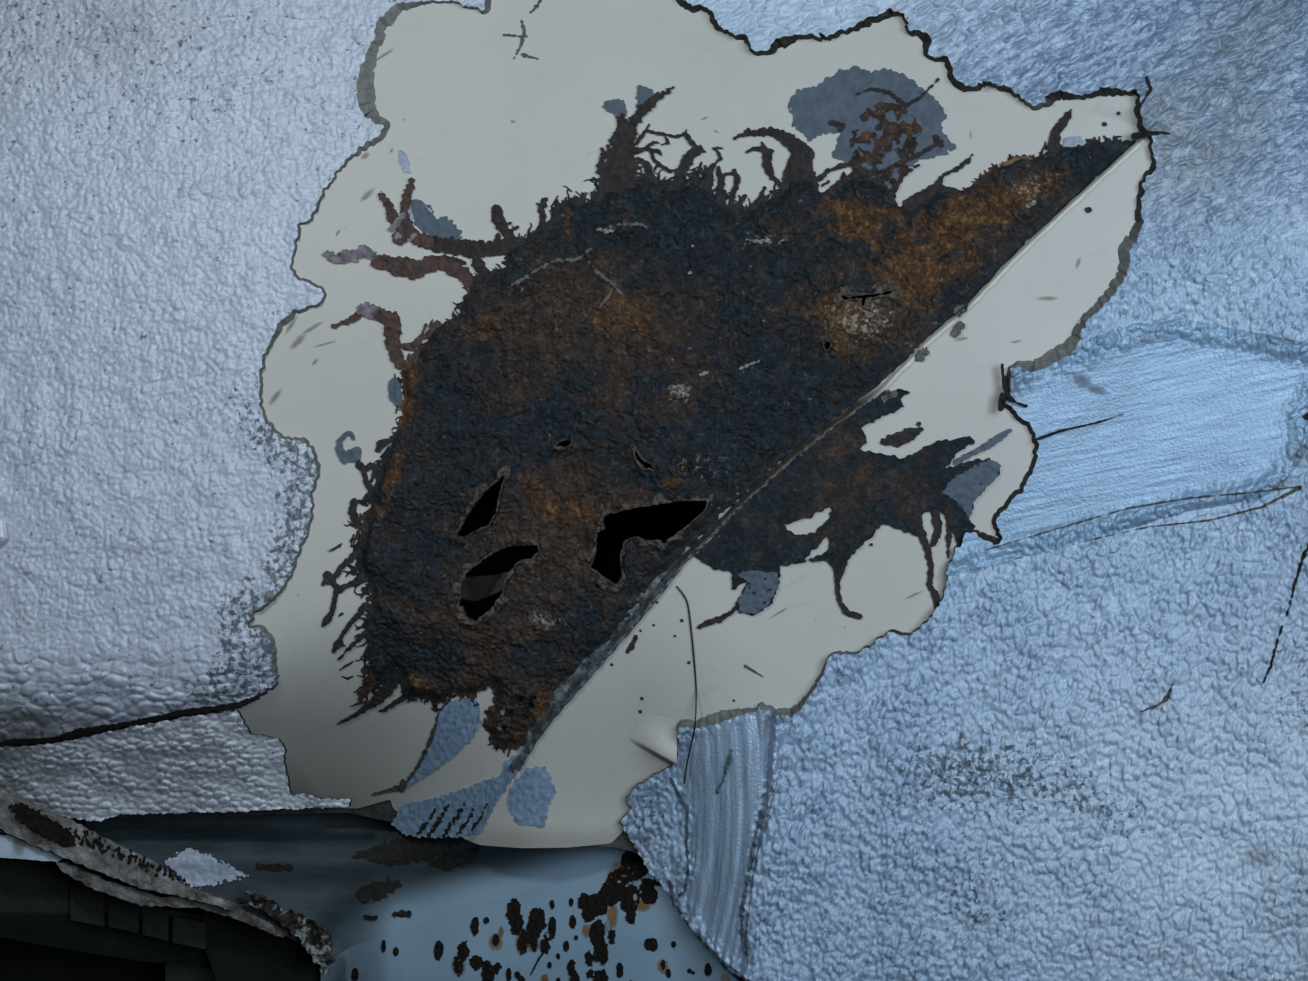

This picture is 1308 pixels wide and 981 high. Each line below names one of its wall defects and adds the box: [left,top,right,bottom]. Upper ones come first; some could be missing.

crack [492,323,510,386]
crack [998,363,1028,411]
peeling [218,0,1152,848]
corrosion [321,85,1138,757]
crack [1036,414,1123,441]
crack [986,485,1302,550]
crack [1263,544,1308,683]
crack [0,695,260,747]
spalling [0,846,203,914]
corrosion [434,850,661,981]
corrosion [644,938,676,978]
corrosion [687,963,712,976]